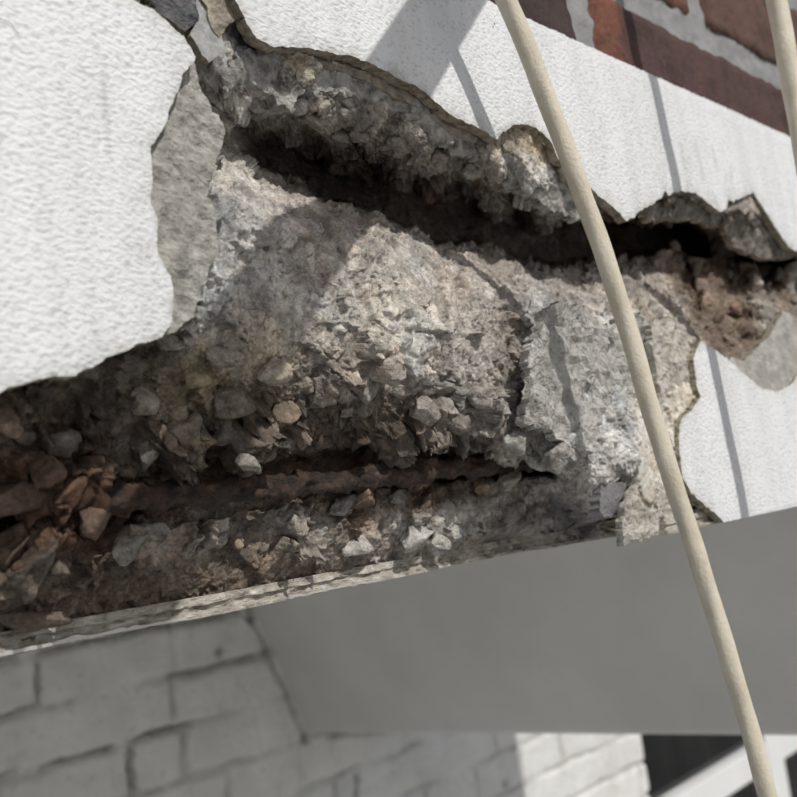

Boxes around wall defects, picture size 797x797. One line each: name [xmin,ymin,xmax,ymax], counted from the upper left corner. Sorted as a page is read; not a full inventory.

crack [137,0,156,8]
spalling [0,0,674,657]
spalling [596,193,797,453]